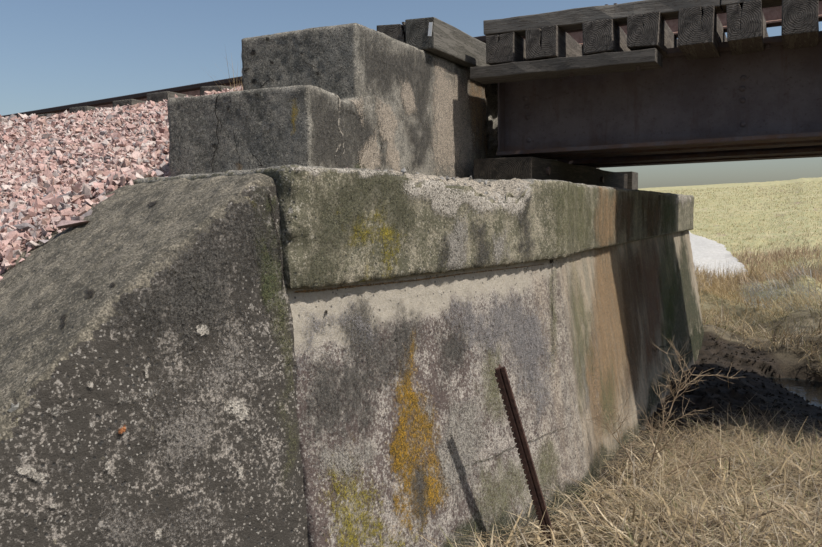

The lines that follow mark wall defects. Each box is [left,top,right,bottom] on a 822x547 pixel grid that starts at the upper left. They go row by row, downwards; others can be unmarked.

crack [209,95,262,171]
leakage [291,89,396,177]
leakage [360,28,433,168]
leakage [302,299,450,530]
leakage [439,294,555,422]
leakage [545,232,704,520]
leakage [444,505,537,547]